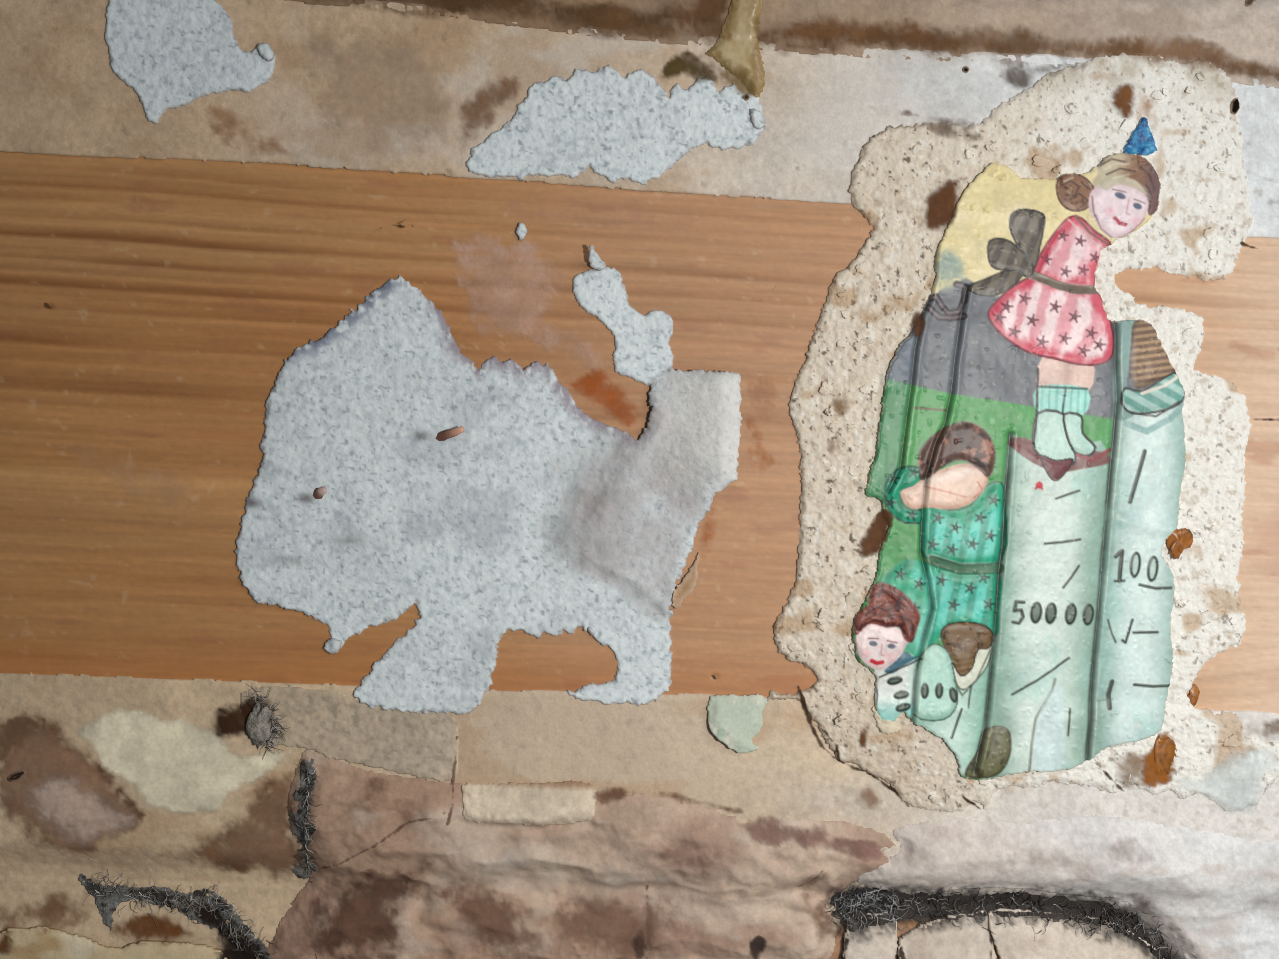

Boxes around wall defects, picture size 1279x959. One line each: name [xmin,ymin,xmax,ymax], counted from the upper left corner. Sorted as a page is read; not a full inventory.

leakage [568,0,727,27]
leakage [784,20,949,45]
leakage [1118,39,1267,74]
peeling [516,223,527,240]
peeling [233,244,743,715]
rust [1123,734,1177,787]
leakage [0,718,137,852]